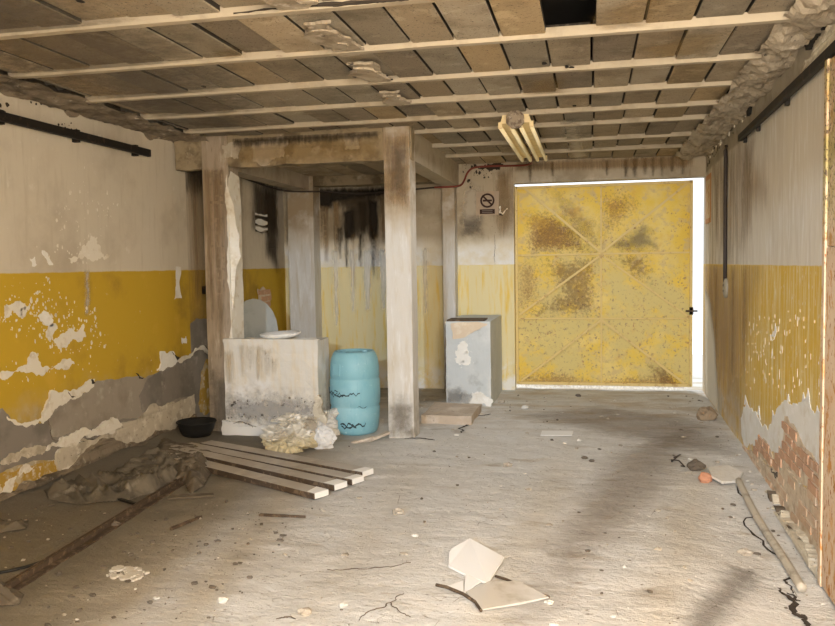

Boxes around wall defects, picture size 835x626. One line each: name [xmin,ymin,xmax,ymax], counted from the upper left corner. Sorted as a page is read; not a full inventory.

spalling [800,24,835,74]
flaking render [21,78,85,98]
damp [320,144,402,322]
flaking render [0,276,210,493]
peeling [741,388,820,579]
crack [743,517,776,555]
crack [327,562,411,571]
crack [359,593,411,620]
crack [779,577,811,626]